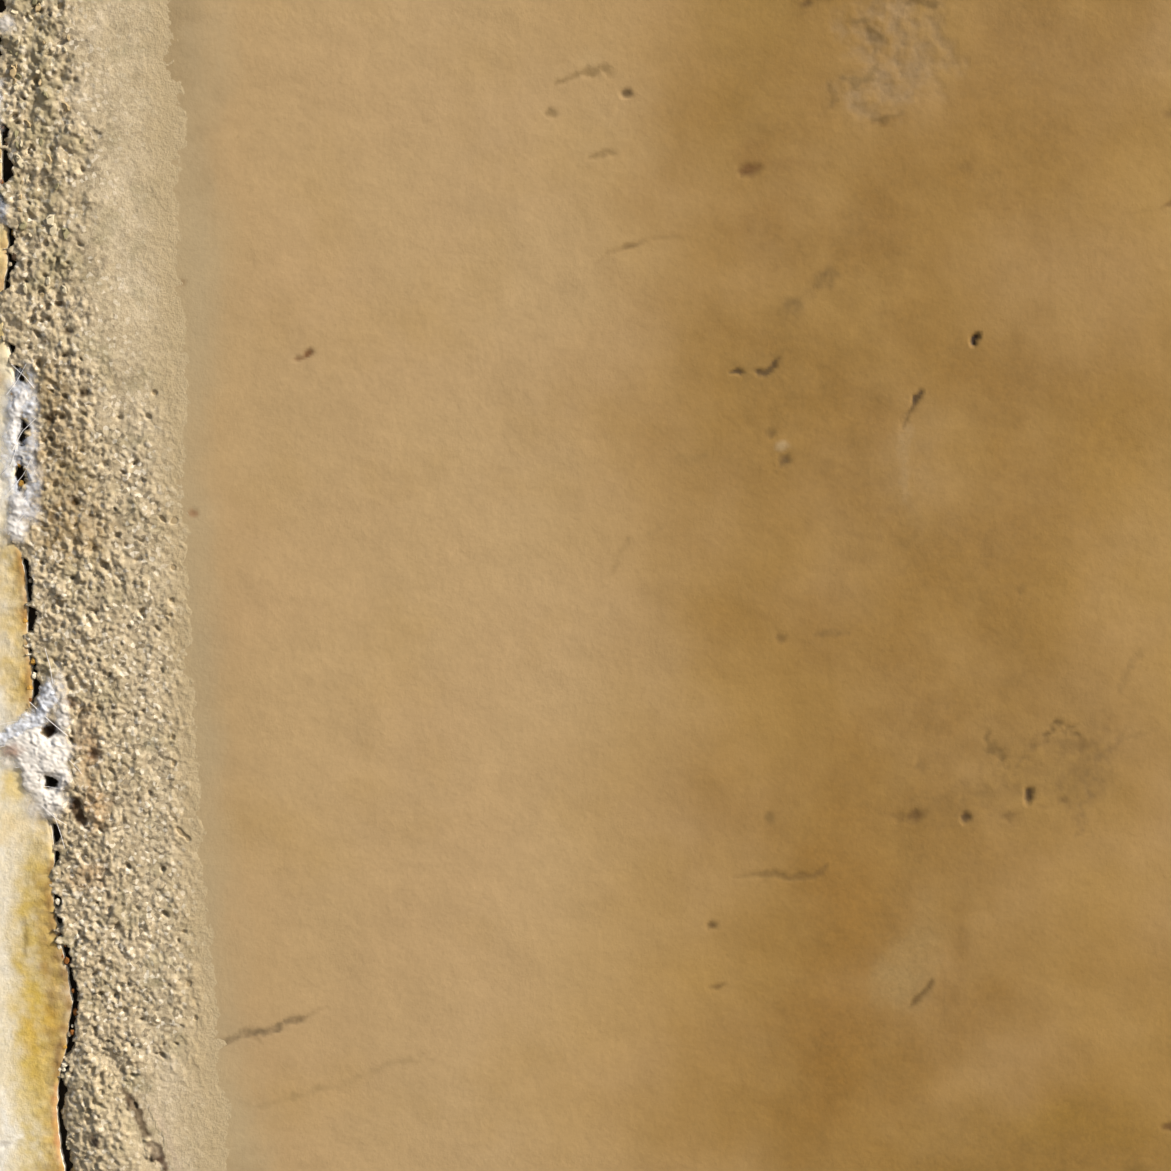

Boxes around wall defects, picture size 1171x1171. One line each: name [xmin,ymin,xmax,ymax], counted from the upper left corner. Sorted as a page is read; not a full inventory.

crack [0,0,8,56]
damp [0,212,8,292]
crack [0,124,16,289]
spalling [4,0,96,302]
damp [0,349,14,415]
crack [7,344,30,491]
damp [0,547,32,725]
crack [23,558,40,702]
crack [53,824,61,864]
damp [0,761,72,1171]
crack [54,894,79,1171]
crack [214,1005,335,1063]